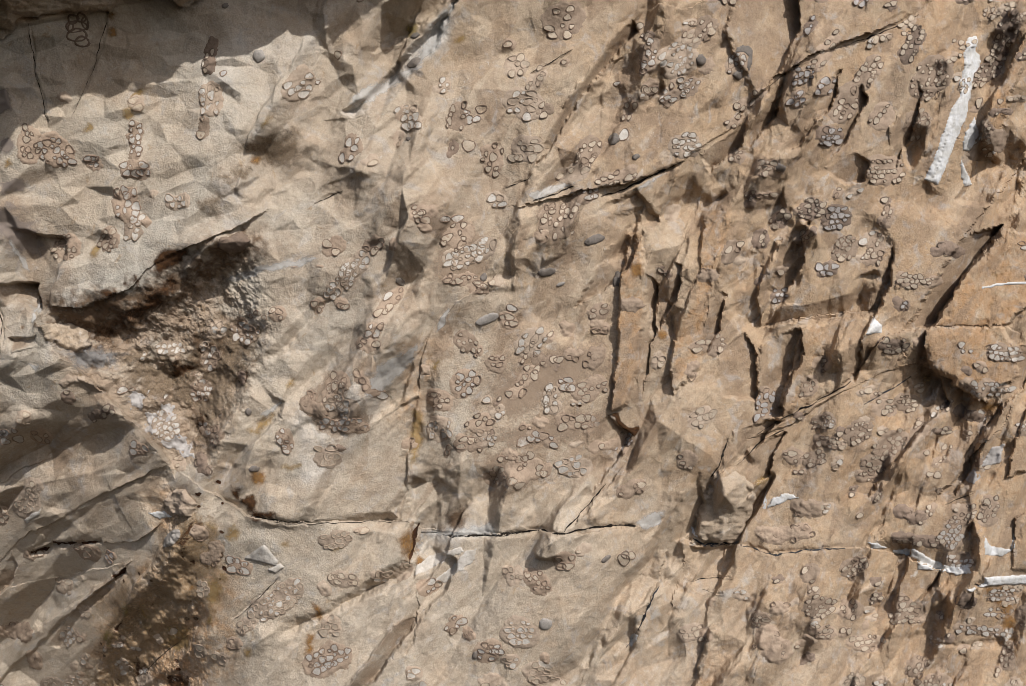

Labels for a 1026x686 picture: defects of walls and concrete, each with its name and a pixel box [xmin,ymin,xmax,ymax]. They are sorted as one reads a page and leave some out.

damp [22,228,267,451]
crack [251,484,636,564]
crack [693,538,845,556]